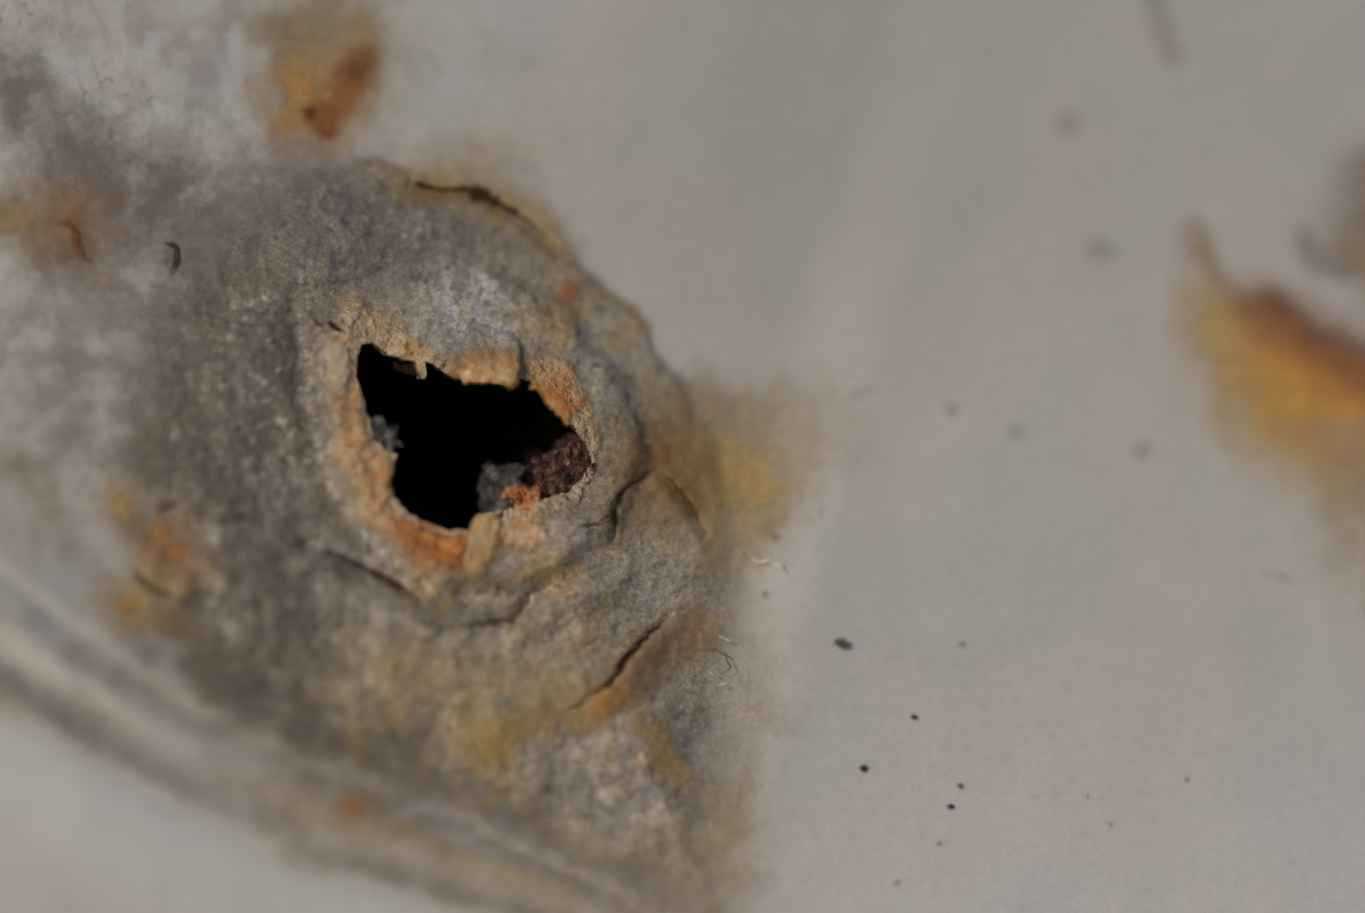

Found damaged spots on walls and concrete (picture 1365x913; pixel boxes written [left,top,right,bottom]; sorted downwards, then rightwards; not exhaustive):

corrosion [257,0,384,139]
crack [413,181,552,243]
corrosion [1191,223,1365,512]
spalling [327,340,586,573]
corrosion [502,484,541,511]
crack [566,620,664,708]